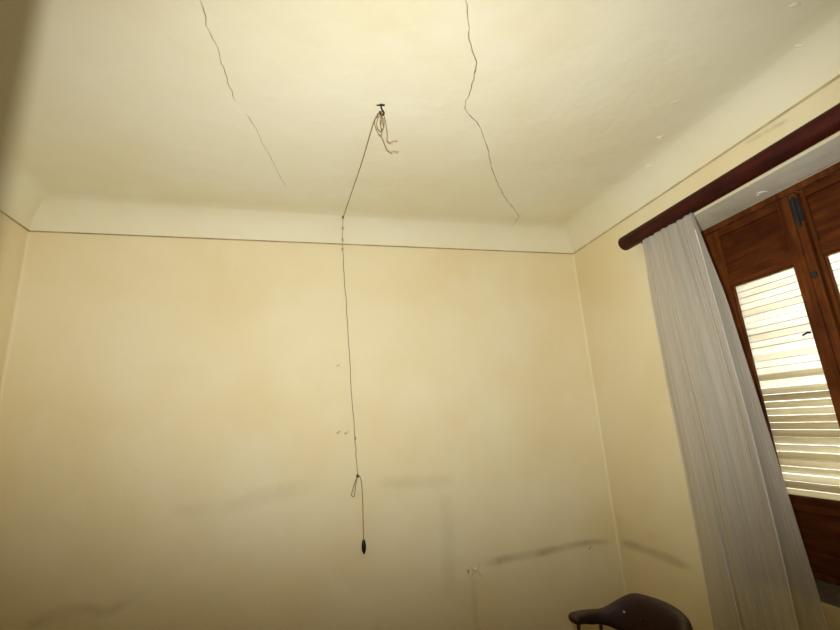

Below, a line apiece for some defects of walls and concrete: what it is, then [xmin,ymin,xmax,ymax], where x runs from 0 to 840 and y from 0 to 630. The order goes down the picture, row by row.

crack [200,0,285,185]
crack [464,0,519,226]